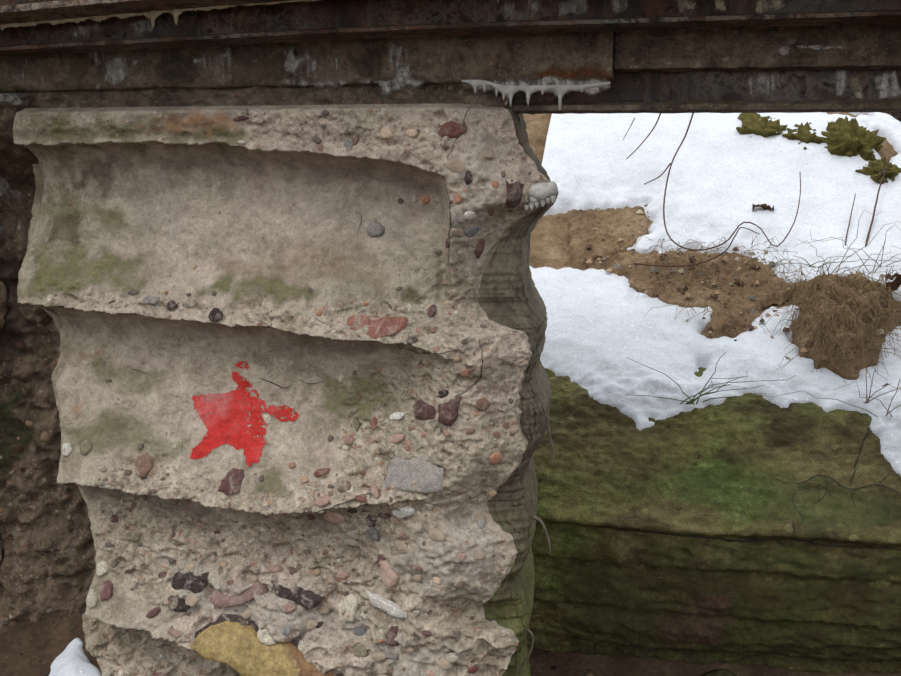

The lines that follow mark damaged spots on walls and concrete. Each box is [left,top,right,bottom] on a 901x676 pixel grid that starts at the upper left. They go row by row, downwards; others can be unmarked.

damp [0,0,318,36]
damp [756,0,783,13]
damp [379,44,422,93]
corrosion [537,67,607,83]
damp [462,77,610,110]